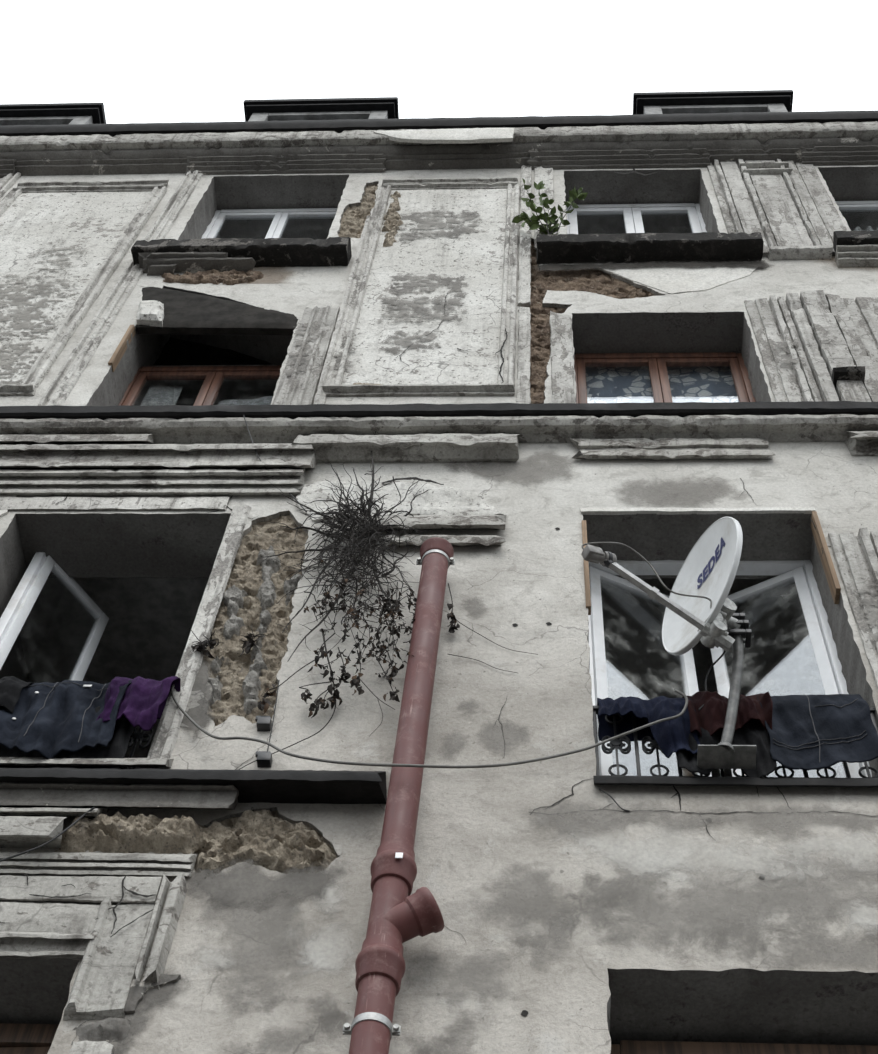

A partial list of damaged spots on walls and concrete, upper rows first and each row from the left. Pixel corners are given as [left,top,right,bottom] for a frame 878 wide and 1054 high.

peeling [382,191,482,247]
flaking render [162,269,264,285]
crack [394,292,448,366]
crack [457,328,507,388]
flaking render [521,241,657,404]
water stain [450,453,569,482]
water stain [620,480,731,505]
flaking render [180,515,308,727]
flaking render [54,809,337,874]
crack [24,873,156,937]
water stain [189,859,341,1002]
water stain [584,854,878,968]